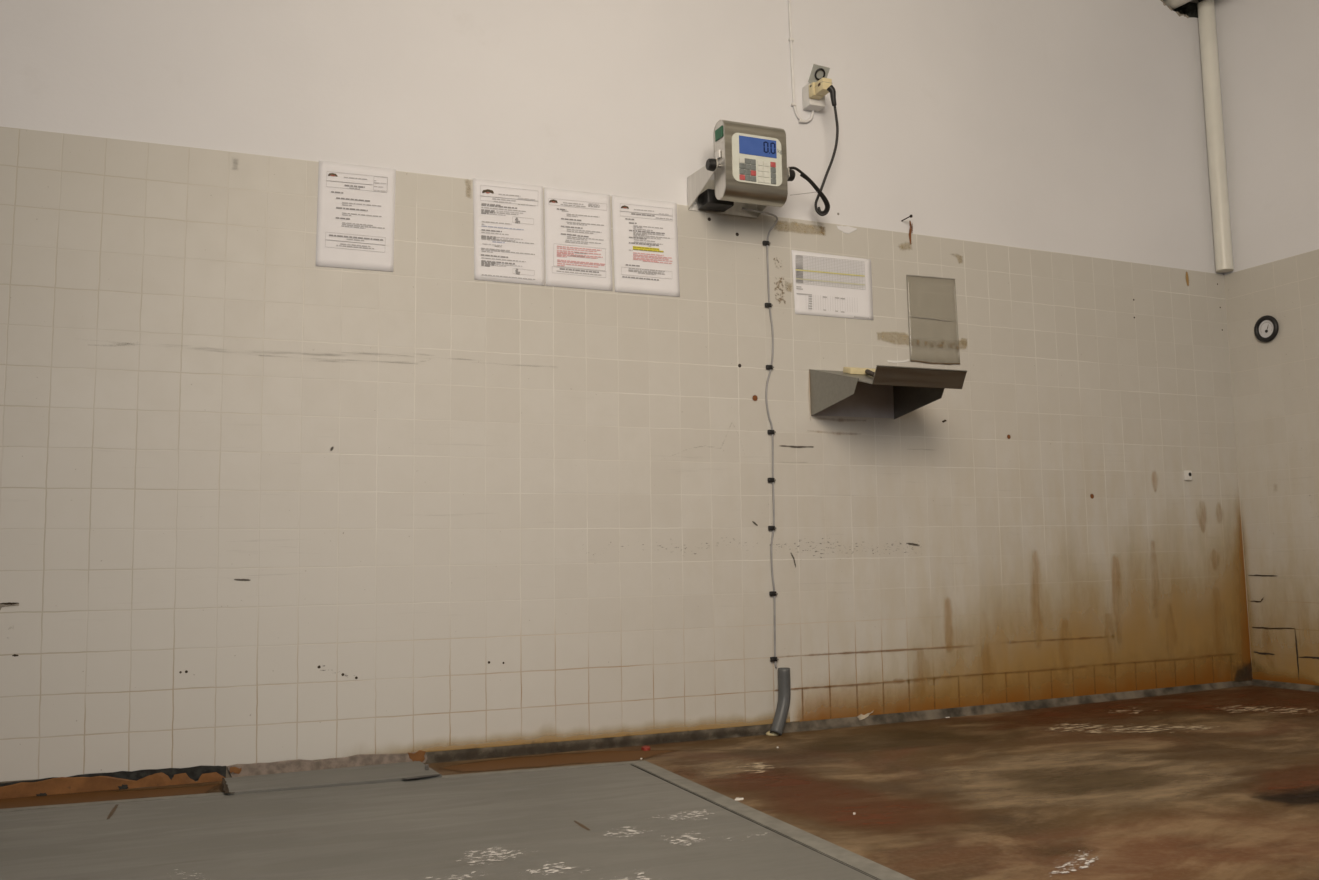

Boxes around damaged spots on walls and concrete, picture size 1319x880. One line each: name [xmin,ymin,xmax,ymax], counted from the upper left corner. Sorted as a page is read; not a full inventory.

leakage [920,559,1319,697]
peeling [0,765,242,809]